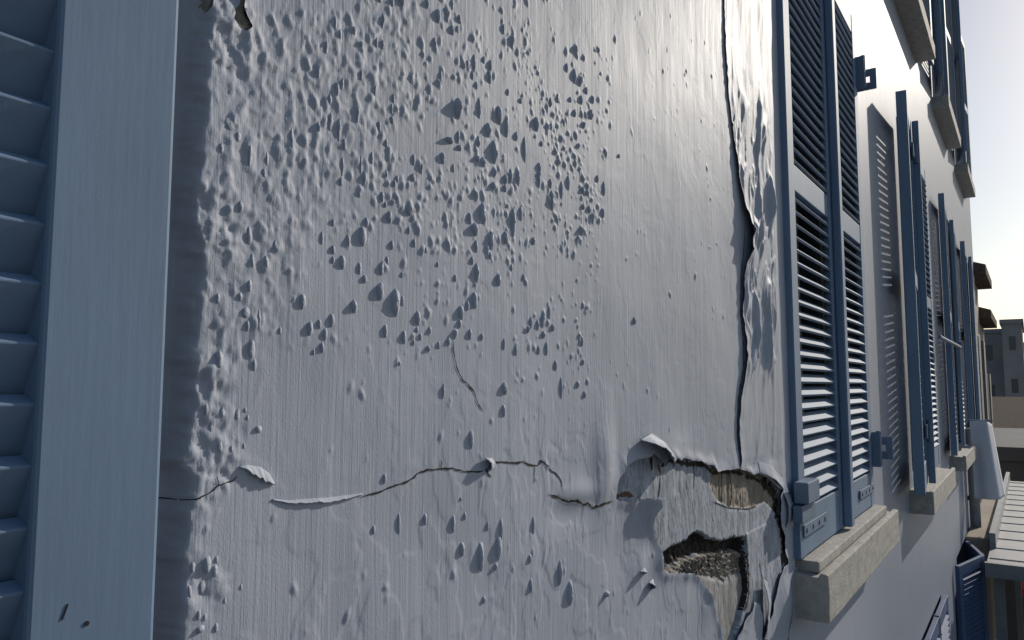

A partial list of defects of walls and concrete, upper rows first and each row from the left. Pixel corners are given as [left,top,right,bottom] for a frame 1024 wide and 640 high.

spalling [616,0,795,640]
crack [158,476,238,500]
peeling [239,465,275,485]
peeling [272,493,363,504]
crack [362,460,612,509]